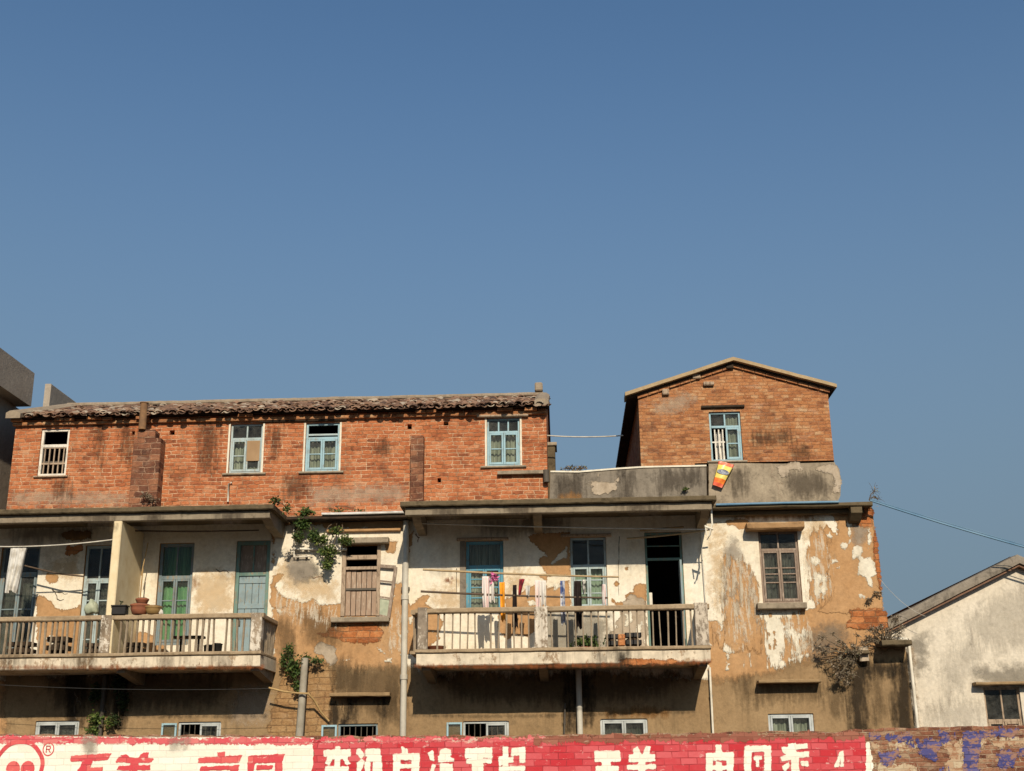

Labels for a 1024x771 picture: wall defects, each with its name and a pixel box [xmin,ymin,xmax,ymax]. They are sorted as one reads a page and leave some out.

peeling [269,573,287,613]
spalling [267,595,443,737]
peeling [497,532,571,639]
spalling [590,473,619,495]
spalling [609,581,679,665]
peeling [725,518,749,530]
peeling [712,554,810,670]
peeling [806,507,889,630]